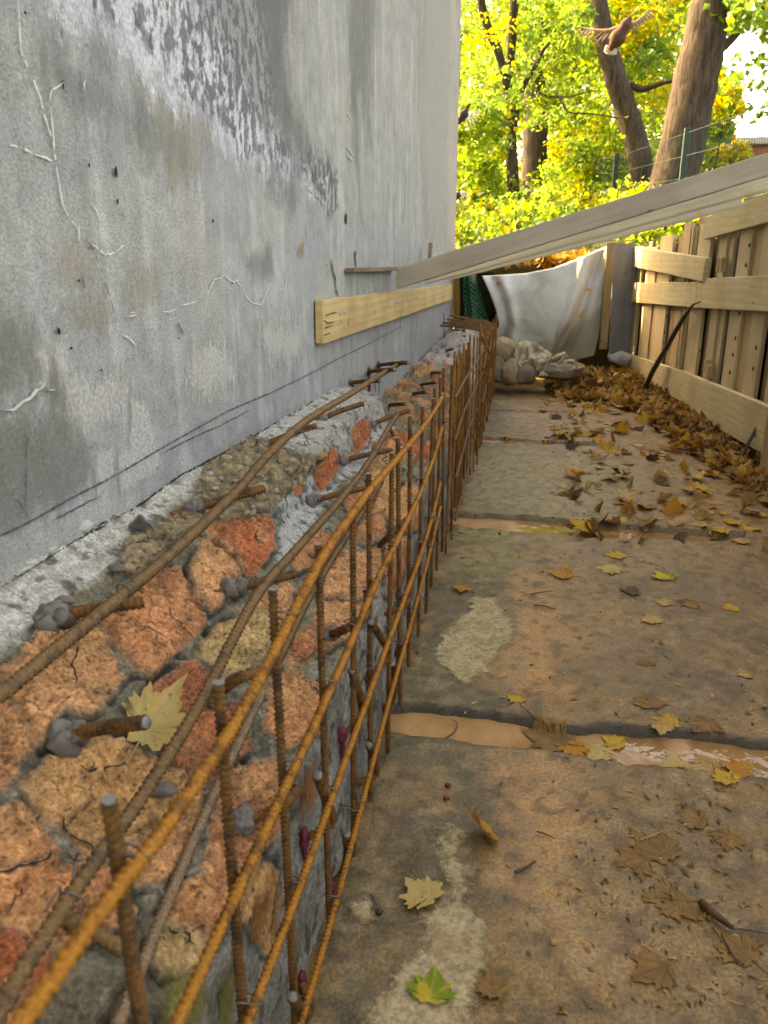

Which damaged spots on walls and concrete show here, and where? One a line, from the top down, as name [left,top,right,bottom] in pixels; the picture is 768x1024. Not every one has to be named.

crack [10,3,136,345]
damp [47,0,338,223]
crack [162,271,290,333]
crack [0,385,344,587]
spalling [0,360,404,703]
spalling [120,413,399,834]
spalling [434,597,515,685]
spalling [0,834,109,1024]
peeling [110,985,131,1024]
peeling [140,689,266,978]
spalling [350,897,374,922]
spalling [363,823,490,1024]